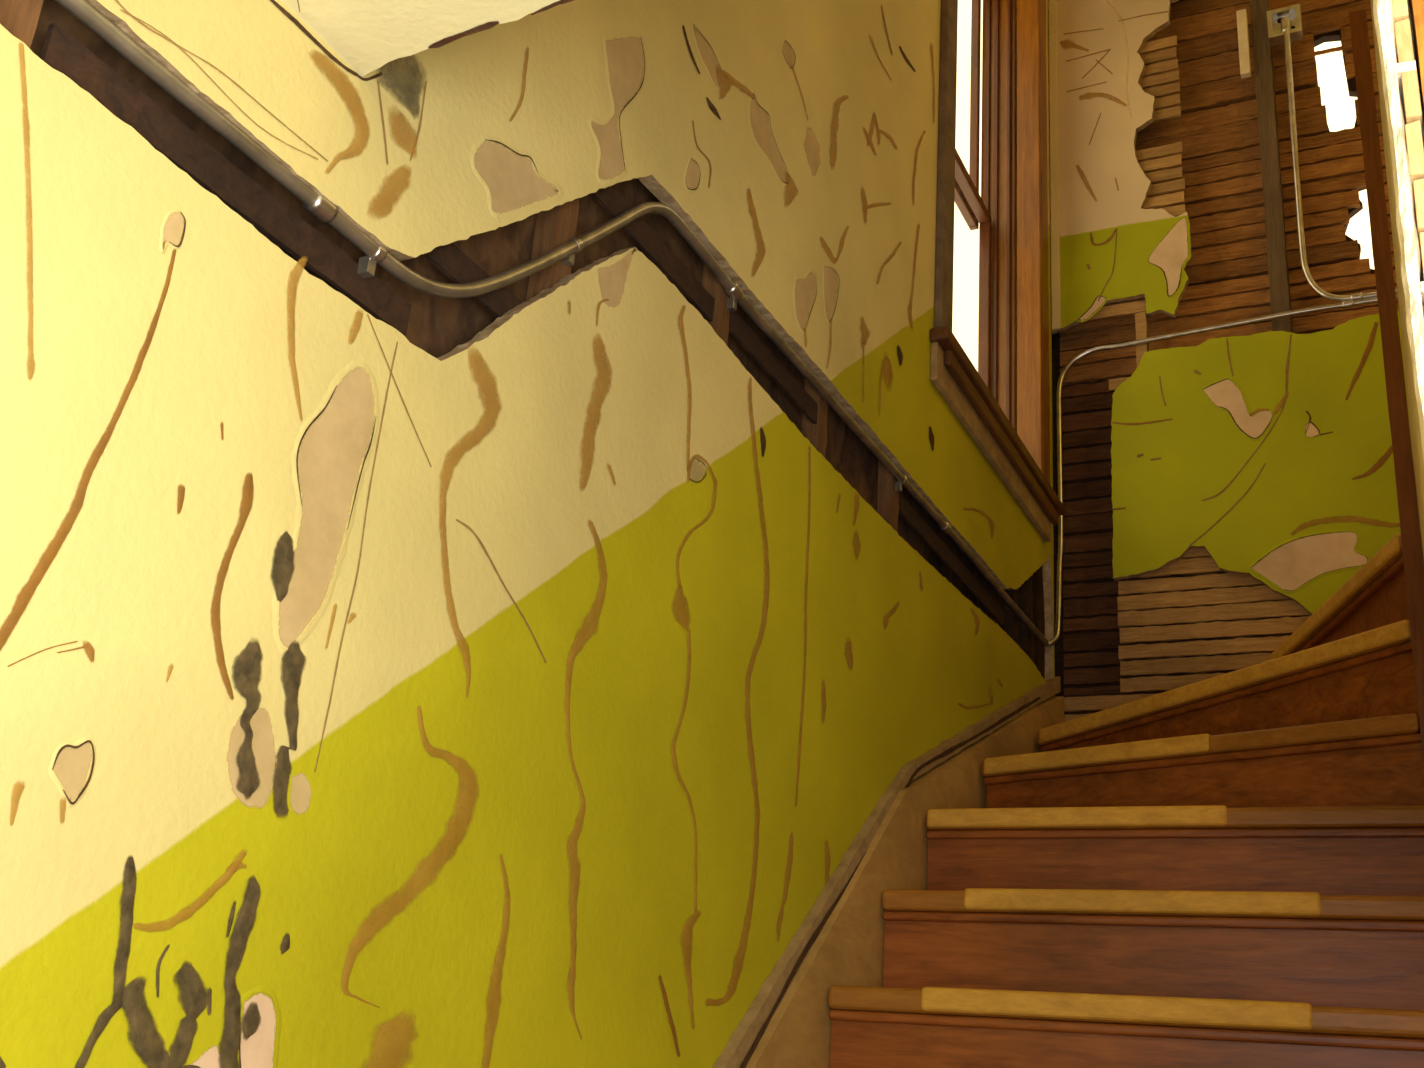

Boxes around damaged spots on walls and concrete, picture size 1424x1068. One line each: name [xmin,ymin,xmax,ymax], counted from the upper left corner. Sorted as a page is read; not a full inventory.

crack [1064,11,1169,145]
spalling [30,0,499,358]
spalling [453,31,704,307]
peeling [1145,216,1191,298]
spalling [727,304,805,433]
leakage [211,474,306,816]
peeling [271,359,380,656]
leakage [325,605,356,648]
peeling [1248,529,1371,594]
leakage [75,852,261,1068]
peeling [238,984,282,1068]
leakage [280,934,290,954]